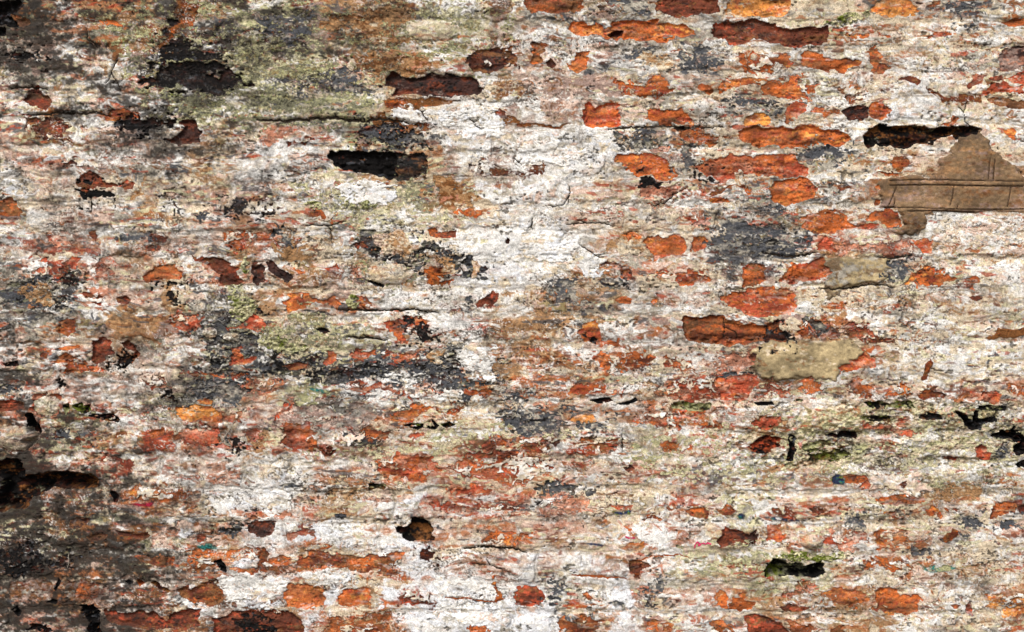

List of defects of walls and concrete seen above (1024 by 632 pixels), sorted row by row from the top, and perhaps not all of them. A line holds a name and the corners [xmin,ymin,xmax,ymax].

water stain [268,65,383,105]
spalling [379,42,590,98]
flaking render [967,45,1024,109]
spalling [327,150,428,181]
flaking render [523,0,982,462]
water stain [698,199,813,270]
spalling [955,383,1024,467]
peeling [0,346,567,632]
spalling [621,541,651,579]
spalling [642,503,797,548]
flaking render [709,474,958,632]
flaking render [990,502,1024,519]